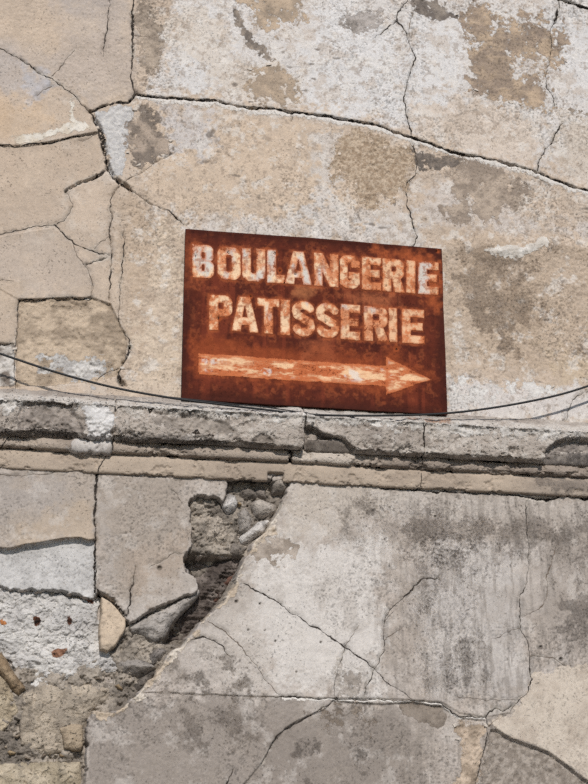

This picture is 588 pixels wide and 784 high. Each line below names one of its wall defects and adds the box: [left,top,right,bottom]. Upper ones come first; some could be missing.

crack [0,0,588,386]
spalling [0,479,300,784]
crack [138,424,588,784]